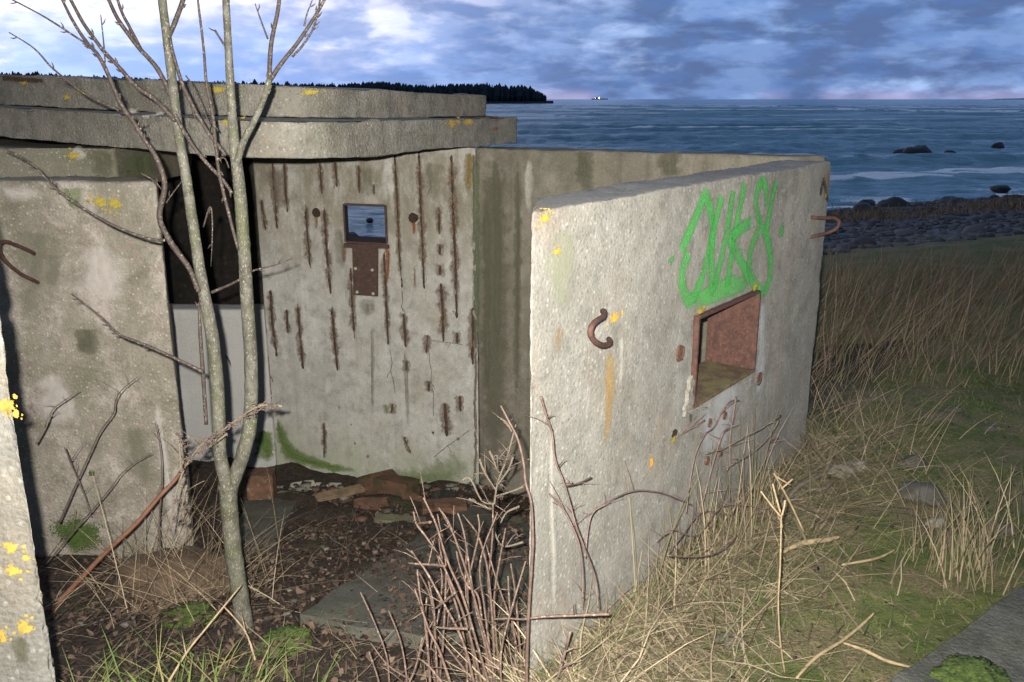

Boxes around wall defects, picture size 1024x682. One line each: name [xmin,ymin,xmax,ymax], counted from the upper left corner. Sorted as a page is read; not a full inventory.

rust [260,163,288,230]
rust [269,290,304,369]
rust [305,204,332,294]
rust [342,246,355,338]
rust [383,155,403,345]
rust [412,153,425,289]
rust [438,154,473,343]
damp [262,424,331,467]
rust [444,396,461,437]